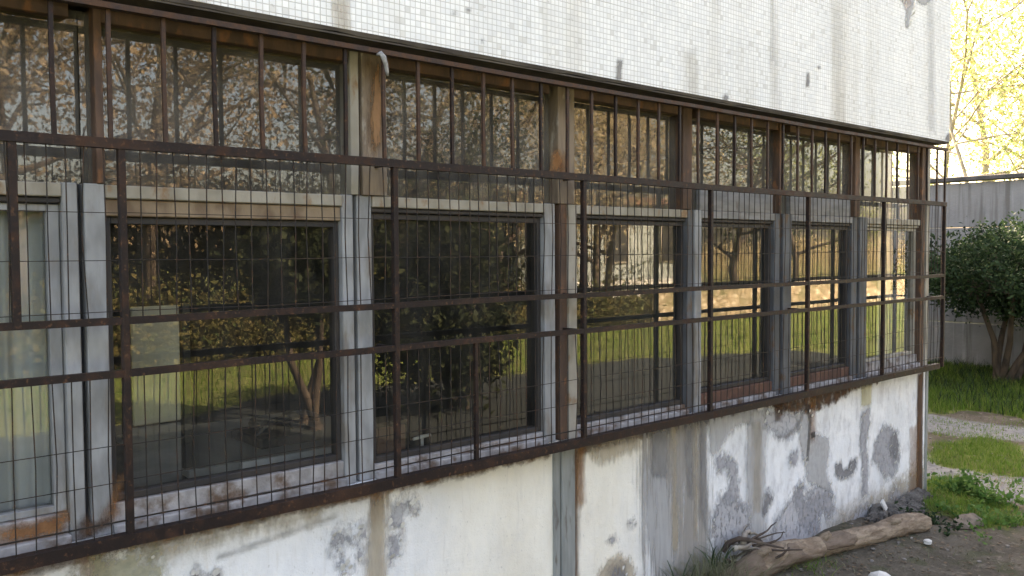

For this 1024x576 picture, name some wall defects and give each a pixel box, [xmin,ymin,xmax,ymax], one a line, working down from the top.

rust [767,382,878,419]
peeling [330,524,367,576]
peeling [388,497,417,566]
rust [302,455,549,576]
water stain [642,409,768,576]
peeling [708,407,901,559]